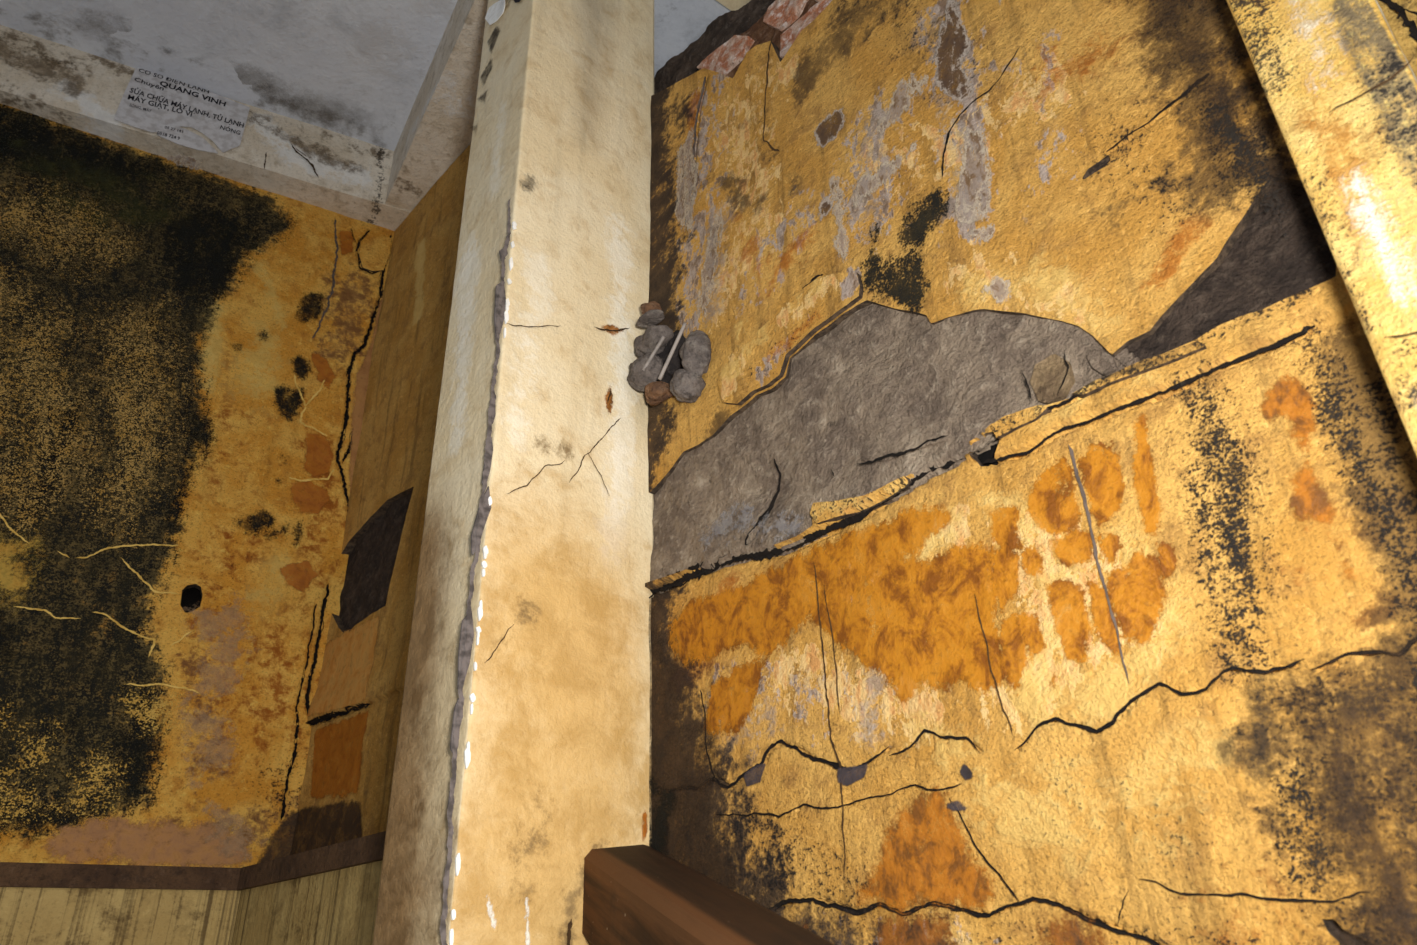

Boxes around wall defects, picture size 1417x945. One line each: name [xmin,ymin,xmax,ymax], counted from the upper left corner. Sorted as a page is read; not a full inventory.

spalling [654,0,832,94]
peeling [814,108,845,147]
peeling [877,0,974,138]
damp [0,104,383,867]
crack [281,583,370,820]
crack [312,219,392,511]
spalling [339,492,412,632]
spalling [440,199,517,945]
corrosion [668,414,1177,737]
spalling [650,128,1337,594]
crack [649,325,1417,945]
damp [1165,318,1417,945]